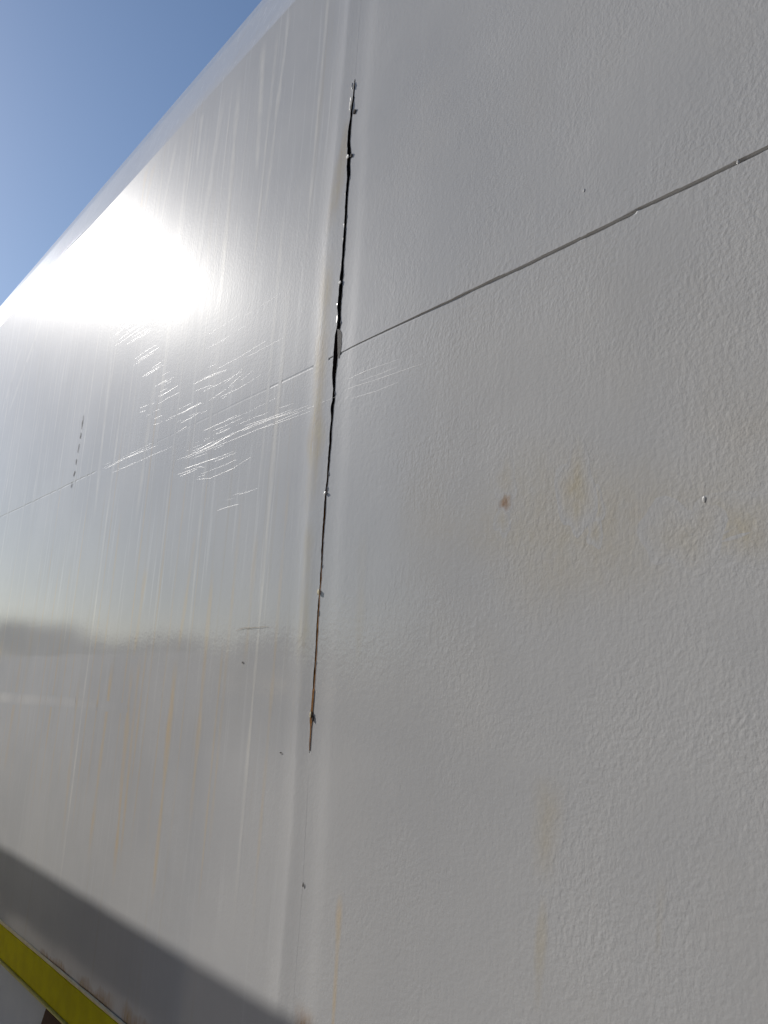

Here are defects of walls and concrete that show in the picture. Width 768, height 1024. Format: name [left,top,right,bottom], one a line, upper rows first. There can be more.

crack [309,80,356,750]